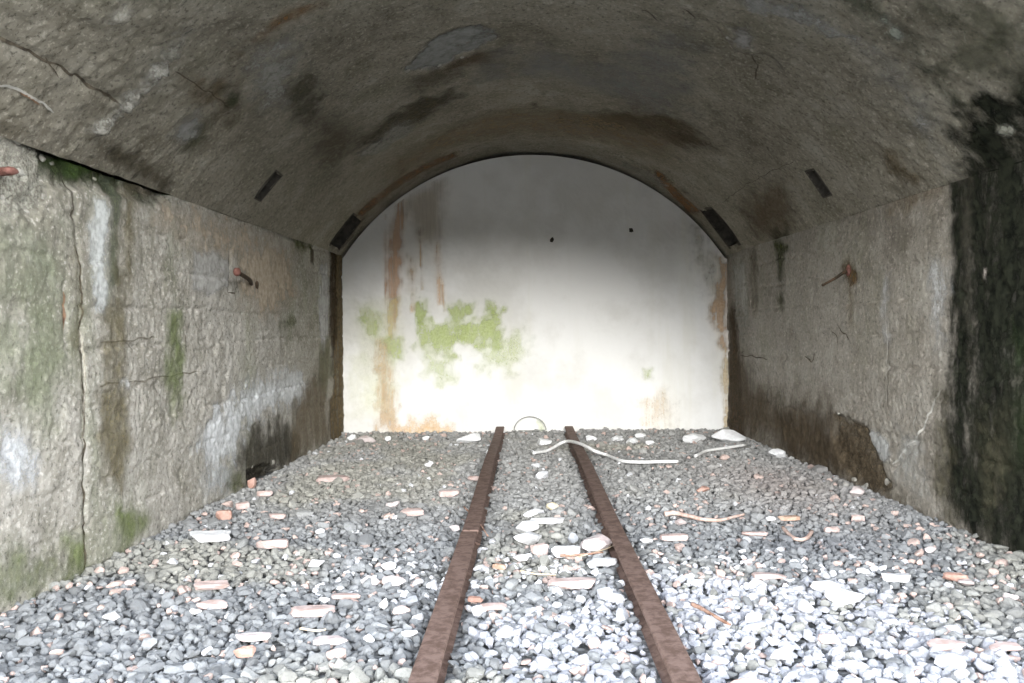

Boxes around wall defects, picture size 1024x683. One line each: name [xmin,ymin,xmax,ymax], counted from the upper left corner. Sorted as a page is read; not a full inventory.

crack [0,85,54,113]
crack [0,36,122,106]
leakage [317,75,464,158]
rust [185,215,294,312]
rust [388,208,421,333]
rust [842,262,857,286]
crack [61,174,197,570]
leakage [196,247,344,491]
rust [375,343,451,434]
rust [710,259,729,427]
spalling [834,412,893,491]